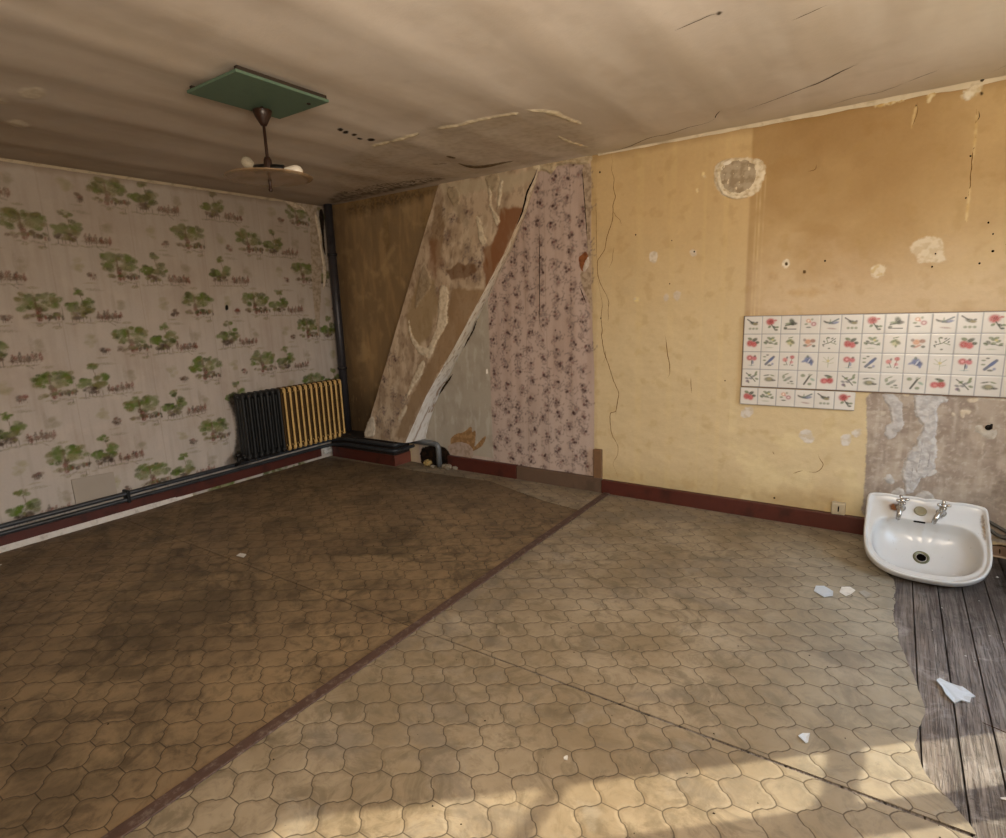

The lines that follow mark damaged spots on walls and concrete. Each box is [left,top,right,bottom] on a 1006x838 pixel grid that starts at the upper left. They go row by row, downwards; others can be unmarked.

crack [749,66,853,109]
crack [838,71,935,129]
peeling [908,235,949,265]
crack [596,112,719,471]